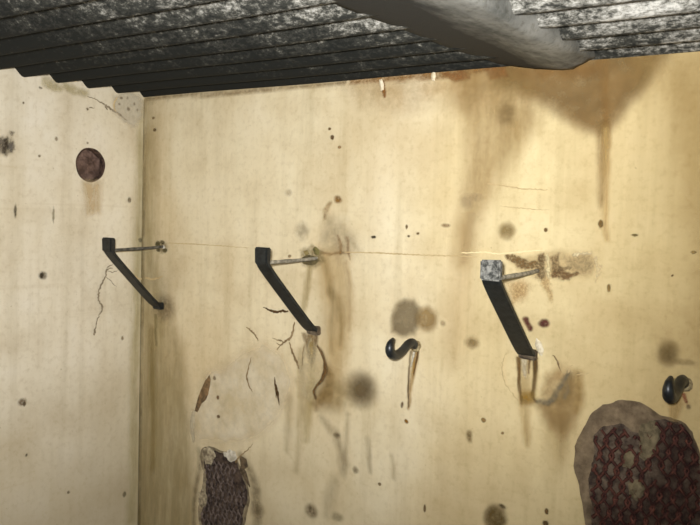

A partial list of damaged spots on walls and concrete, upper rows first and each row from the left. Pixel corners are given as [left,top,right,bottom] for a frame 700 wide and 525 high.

water stain [492,54,663,155]
crack [93,264,117,335]
crack [246,307,305,372]
crack [272,377,280,404]
rust [304,335,317,362]
rust [401,352,419,407]
rust [517,357,537,402]
rust [523,317,549,331]
peeling [191,348,288,525]
spalling [574,400,700,525]